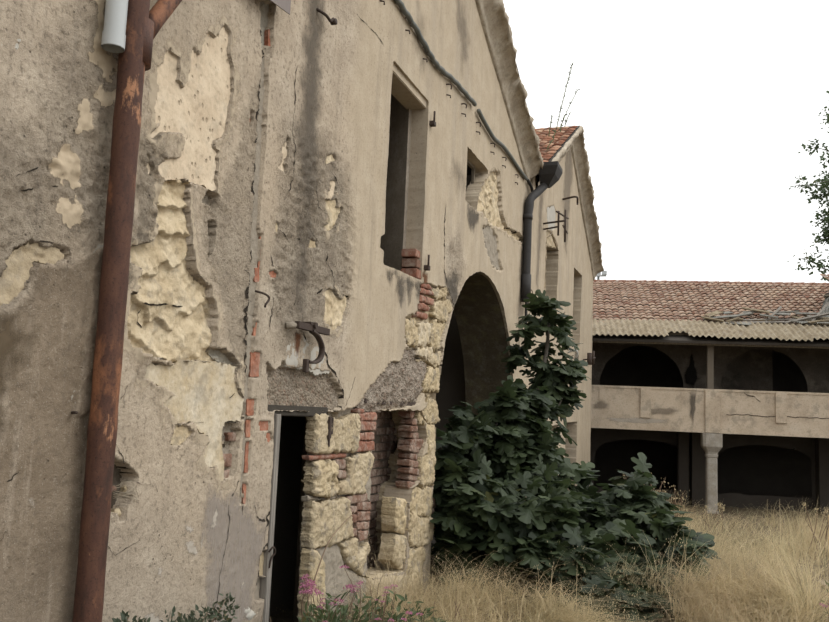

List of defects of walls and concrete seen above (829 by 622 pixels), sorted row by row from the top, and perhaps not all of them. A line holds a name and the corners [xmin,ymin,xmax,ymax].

peeling [75,0,118,134]
damp [301,0,322,205]
spalling [0,242,64,306]
peeling [48,143,84,229]
spalling [123,12,246,494]
spalling [325,181,341,231]
spalling [323,290,347,330]
spalling [477,172,519,271]
damp [0,318,22,392]
spalling [111,464,139,516]
crack [215,481,270,607]